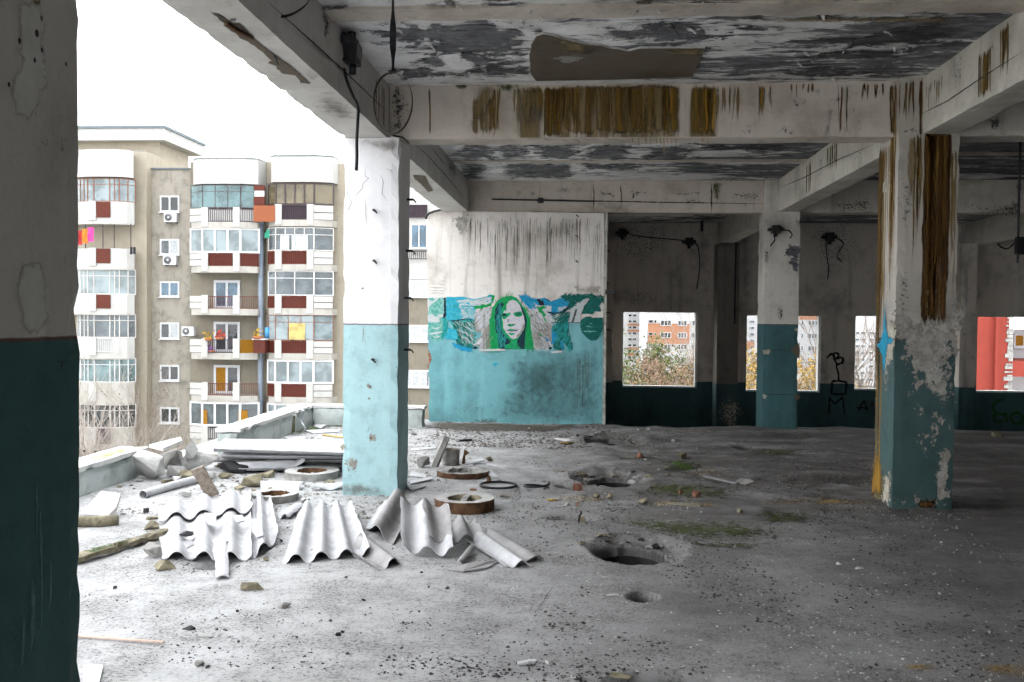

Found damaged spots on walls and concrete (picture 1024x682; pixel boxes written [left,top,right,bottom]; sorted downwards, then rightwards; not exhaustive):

spalling [212,13,310,84]
spalling [322,0,784,81]
rust [978,24,1009,97]
rust [473,87,500,141]
rust [513,85,740,143]
rust [840,87,848,131]
peeling [447,142,786,180]
spalling [784,244,802,271]
rust [861,76,957,495]
peeling [879,299,974,507]